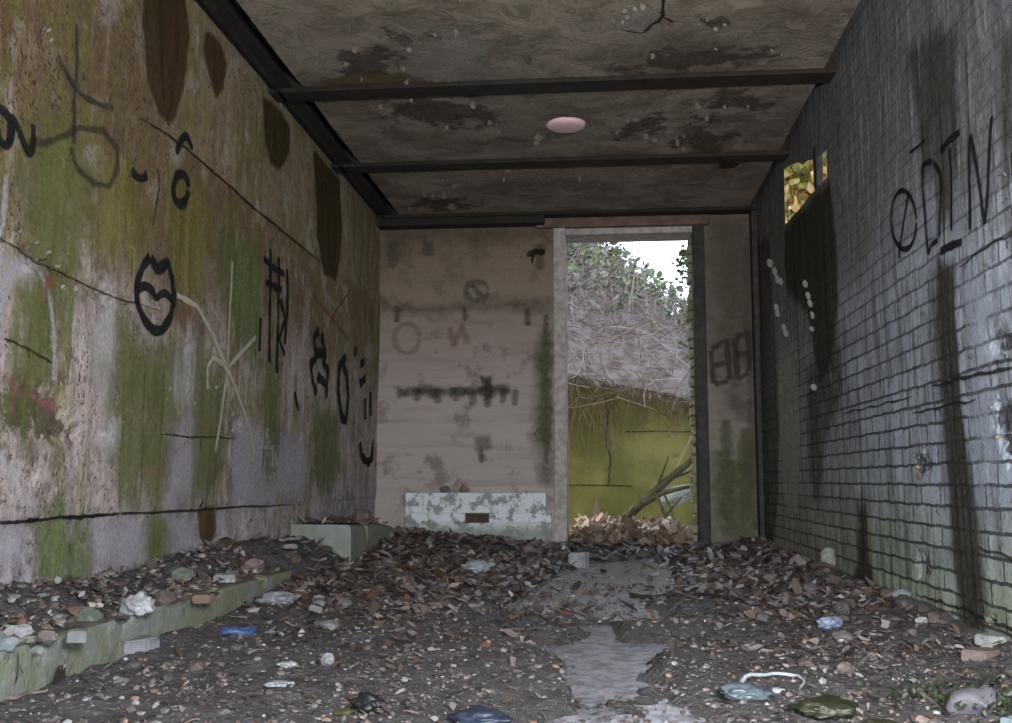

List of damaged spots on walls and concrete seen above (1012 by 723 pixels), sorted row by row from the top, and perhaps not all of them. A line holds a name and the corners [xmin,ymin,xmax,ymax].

water stain [3,114,145,442]
crack [0,500,291,525]
water stain [112,312,183,561]
water stain [192,332,229,508]
water stain [204,31,227,96]
water stain [167,169,283,481]
water stain [263,99,290,170]
water stain [312,400,340,494]
water stain [314,151,342,280]
crack [621,0,673,34]
water stain [713,182,841,541]
water stain [911,29,984,631]